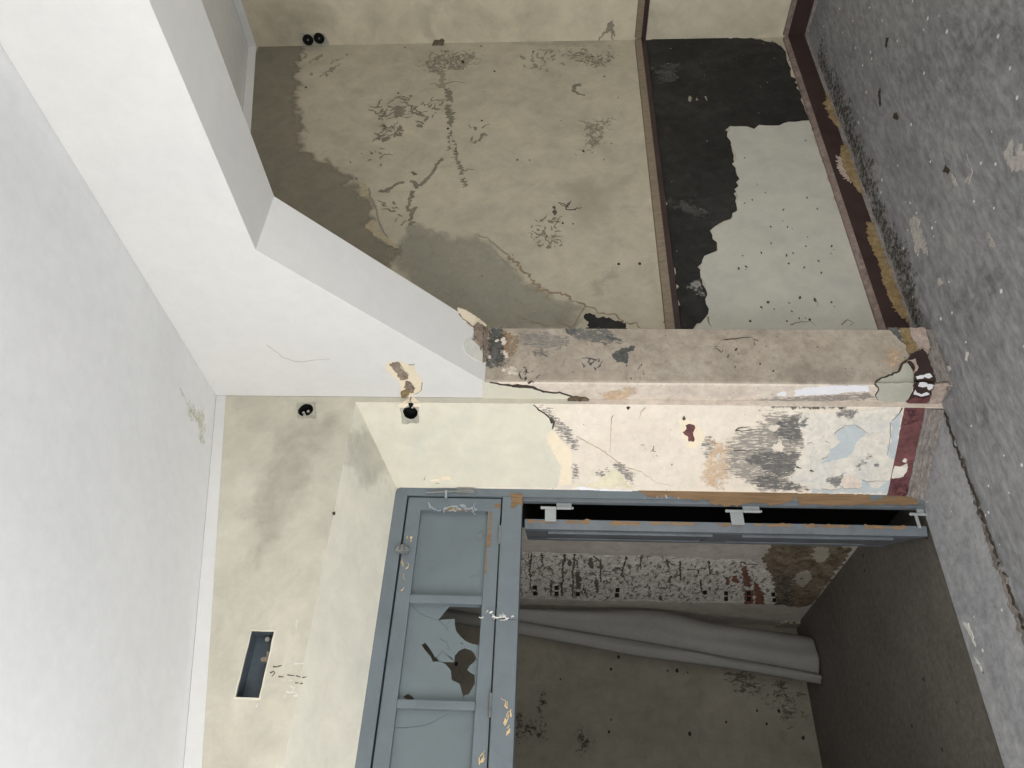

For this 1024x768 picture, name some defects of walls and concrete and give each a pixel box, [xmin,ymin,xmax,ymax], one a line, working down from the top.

water stain [243,46,574,368]
crack [490,381,573,397]
crack [475,235,640,328]
peeling [356,38,953,573]
flaking render [520,545,852,608]
crack [943,411,1024,645]